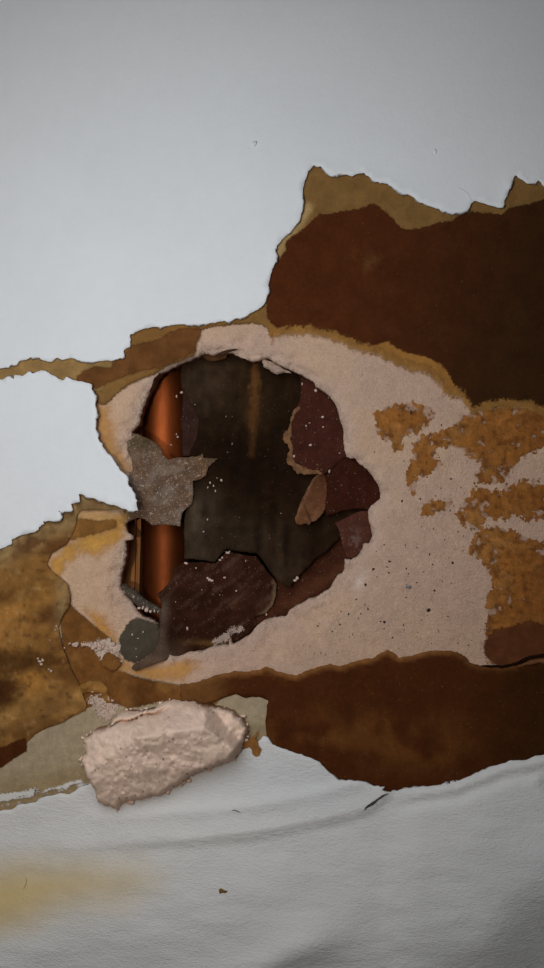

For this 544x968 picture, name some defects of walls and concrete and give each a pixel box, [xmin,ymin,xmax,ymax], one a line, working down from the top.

water stain [266,199,544,416]
flaking render [47,322,544,684]
water stain [50,514,123,575]
water stain [483,620,544,666]
water stain [0,738,27,767]